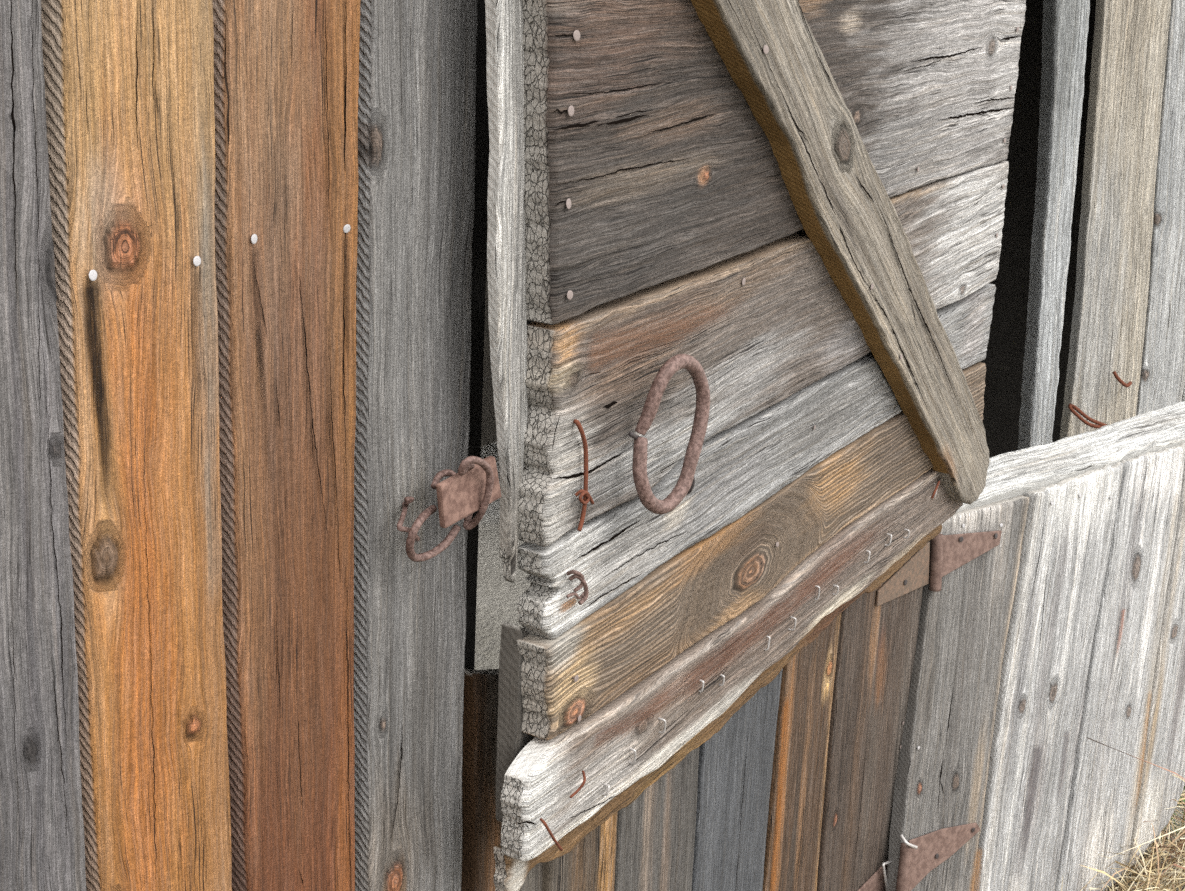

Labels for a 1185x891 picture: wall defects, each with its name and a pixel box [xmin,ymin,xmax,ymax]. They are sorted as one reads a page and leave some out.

crack [902,36,1022,71]
crack [553,80,717,132]
crack [556,158,688,206]